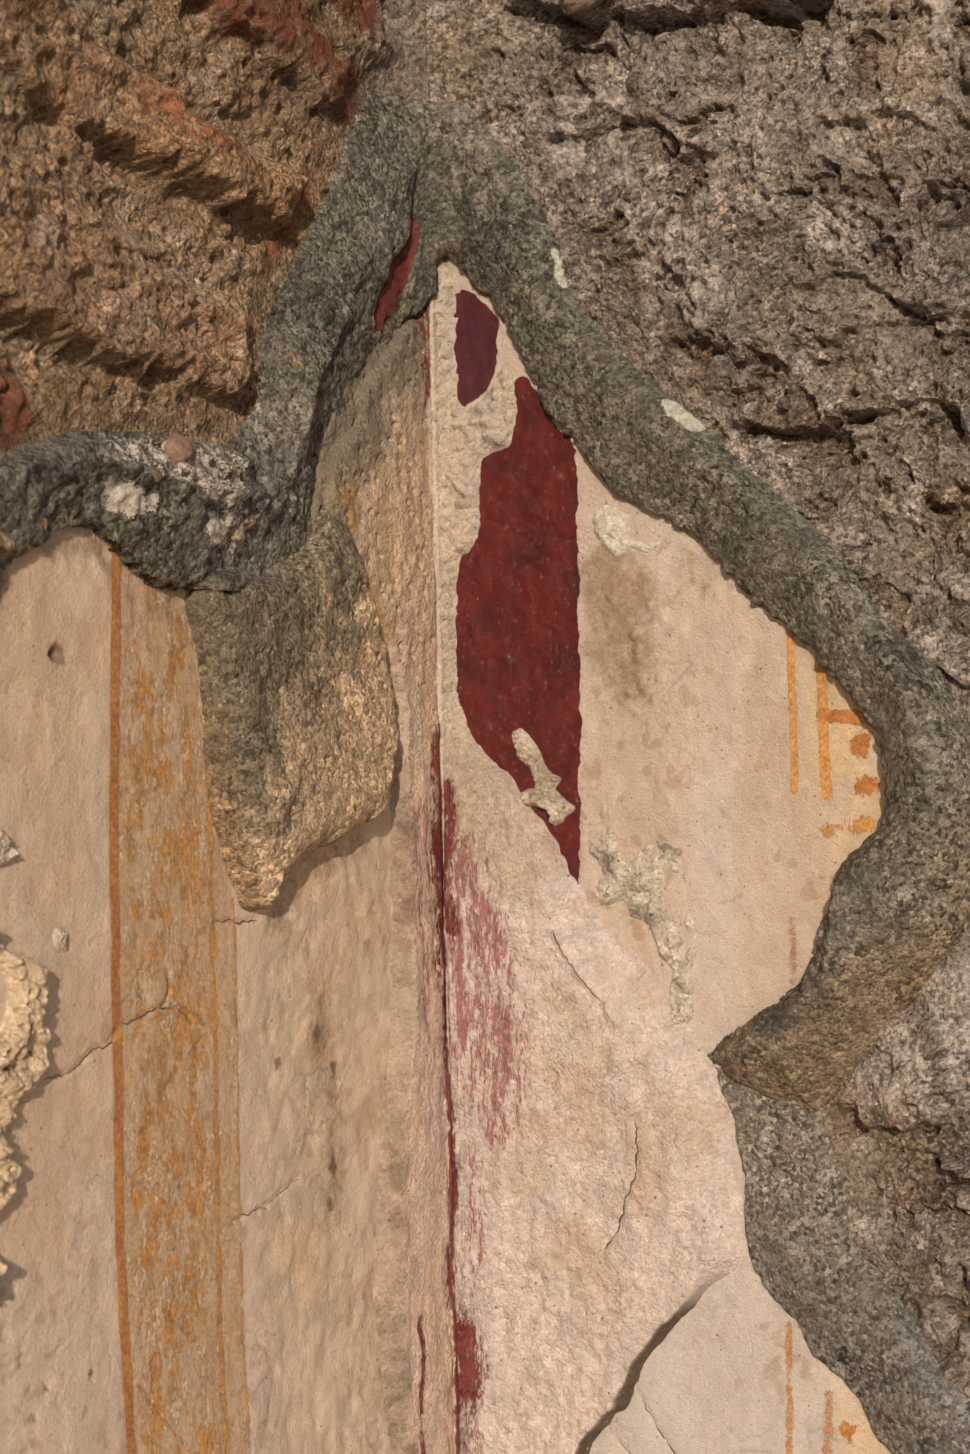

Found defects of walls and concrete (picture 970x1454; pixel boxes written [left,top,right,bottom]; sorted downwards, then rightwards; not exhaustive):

peeling [512,728,575,826]
spalling [0,828,18,866]
spalling [0,929,51,1210]
crack [43,973,188,1081]
crack [551,929,610,1019]
spalling [589,828,696,1025]
crack [602,1121,639,1253]
crack [641,1396,676,1454]